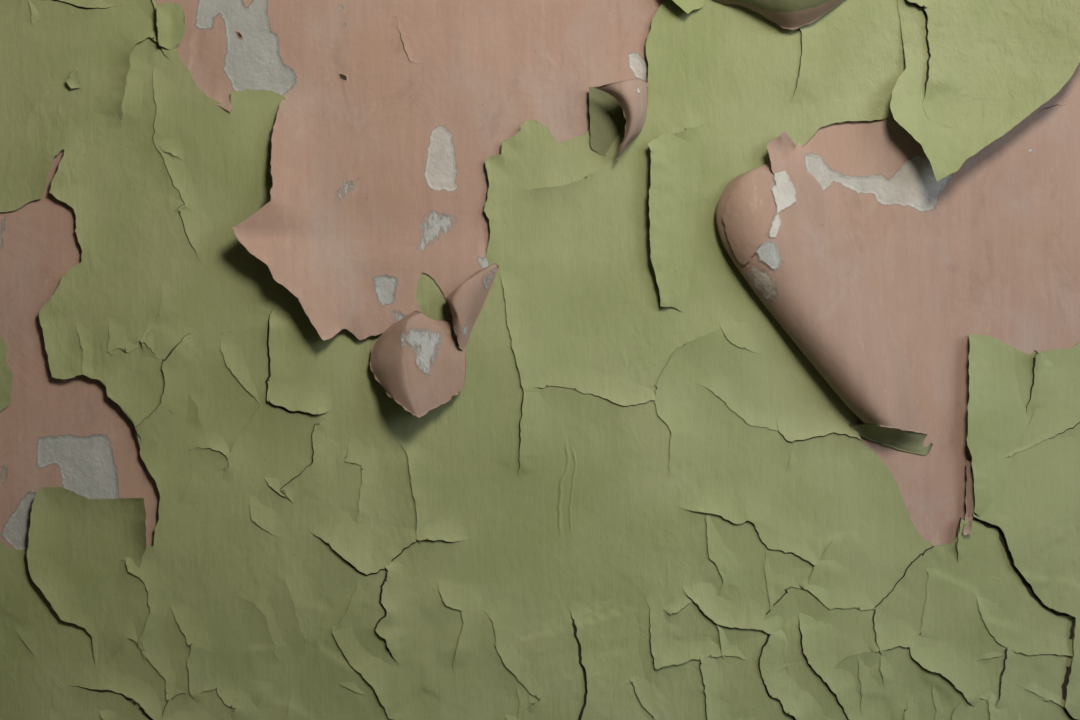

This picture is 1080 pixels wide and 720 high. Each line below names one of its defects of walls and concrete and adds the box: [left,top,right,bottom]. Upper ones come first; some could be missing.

peeling [0,149,160,668]
peeling [156,0,705,340]
crack [63,269,1080,720]
peeling [767,0,1080,546]